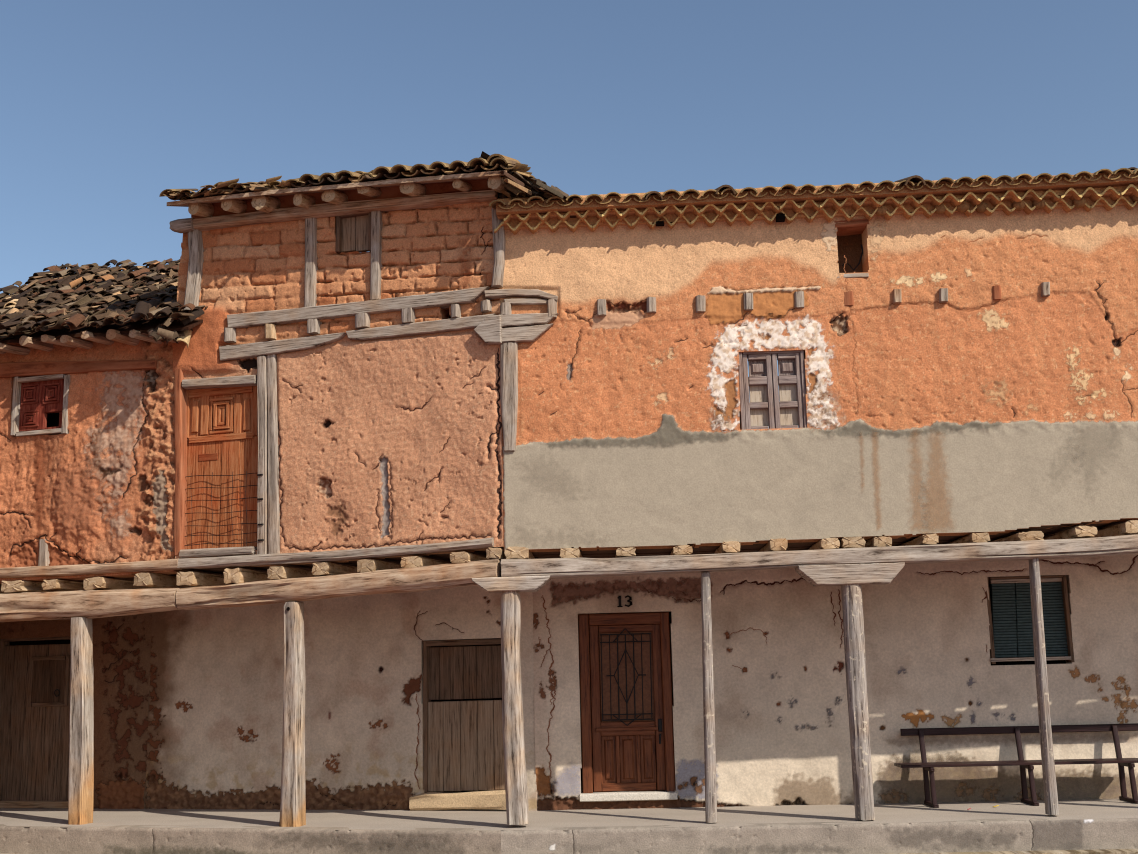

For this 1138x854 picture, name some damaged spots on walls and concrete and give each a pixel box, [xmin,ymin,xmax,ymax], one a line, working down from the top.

peeling [707,314,846,432]
crack [830,255,1007,411]
crack [1095,281,1138,348]
peeling [84,370,173,551]
crack [278,337,502,551]
crack [0,511,127,564]
flaking render [550,577,712,606]
crack [916,555,1138,602]
flaking render [95,620,281,810]
crack [539,595,556,778]
flaking render [305,778,415,810]
flaking render [535,767,743,811]